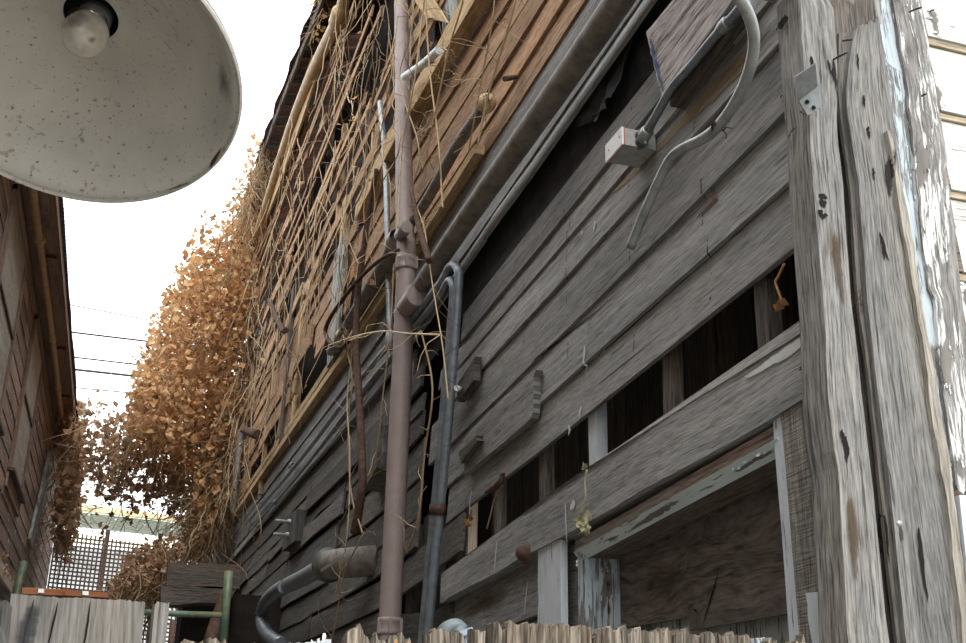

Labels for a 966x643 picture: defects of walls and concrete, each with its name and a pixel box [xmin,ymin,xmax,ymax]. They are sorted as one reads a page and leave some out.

peeling [927,9,942,37]
peeling [907,140,930,205]
peeling [733,450,774,472]
peeling [626,495,693,534]
peeling [599,562,613,620]